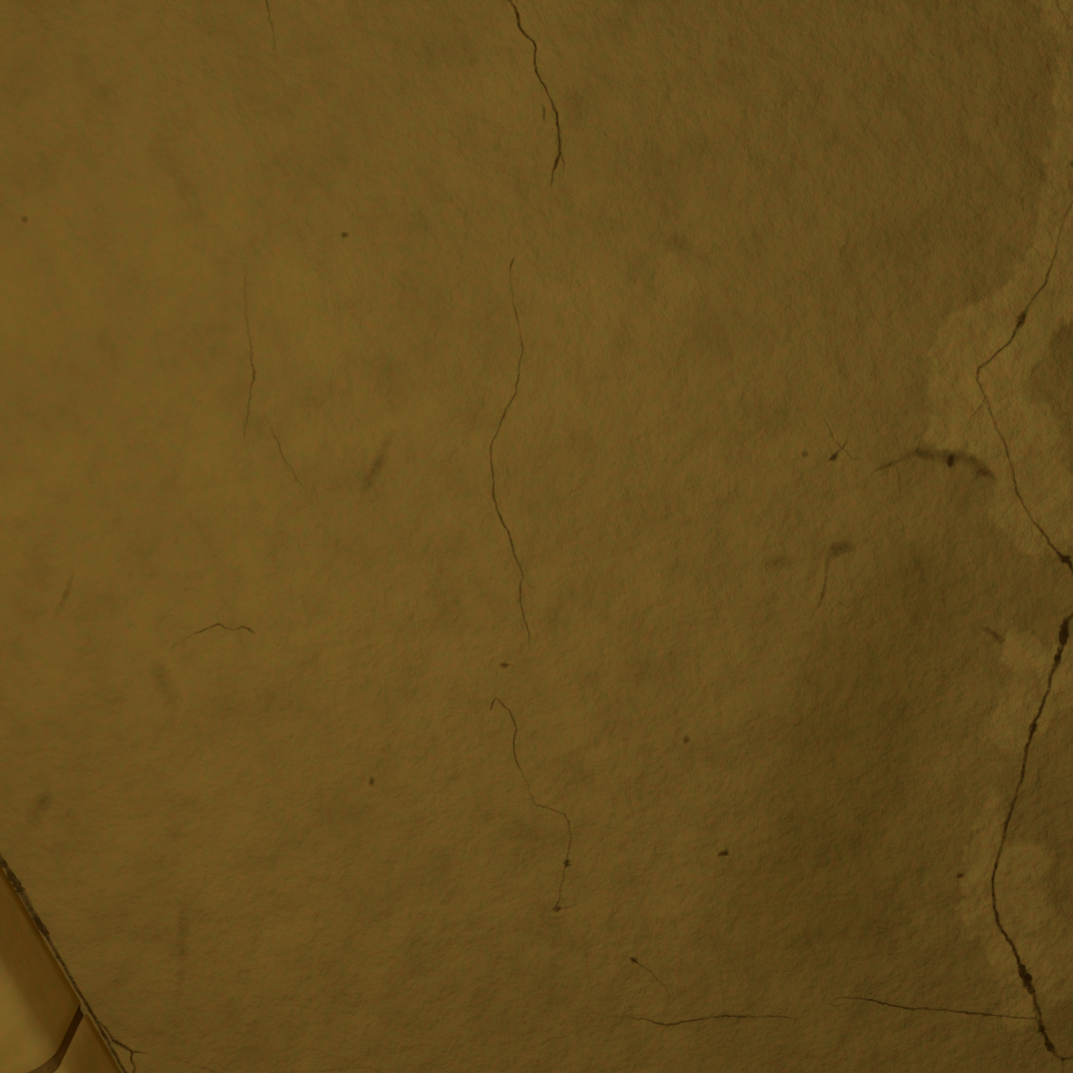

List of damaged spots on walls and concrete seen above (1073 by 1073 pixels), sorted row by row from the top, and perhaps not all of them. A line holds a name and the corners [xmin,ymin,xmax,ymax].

crack [513,5,560,170]
crack [977,284,1045,374]
crack [1040,529,1073,572]
crack [952,613,1073,1059]
crack [0,857,133,1073]
crack [867,999,926,1010]